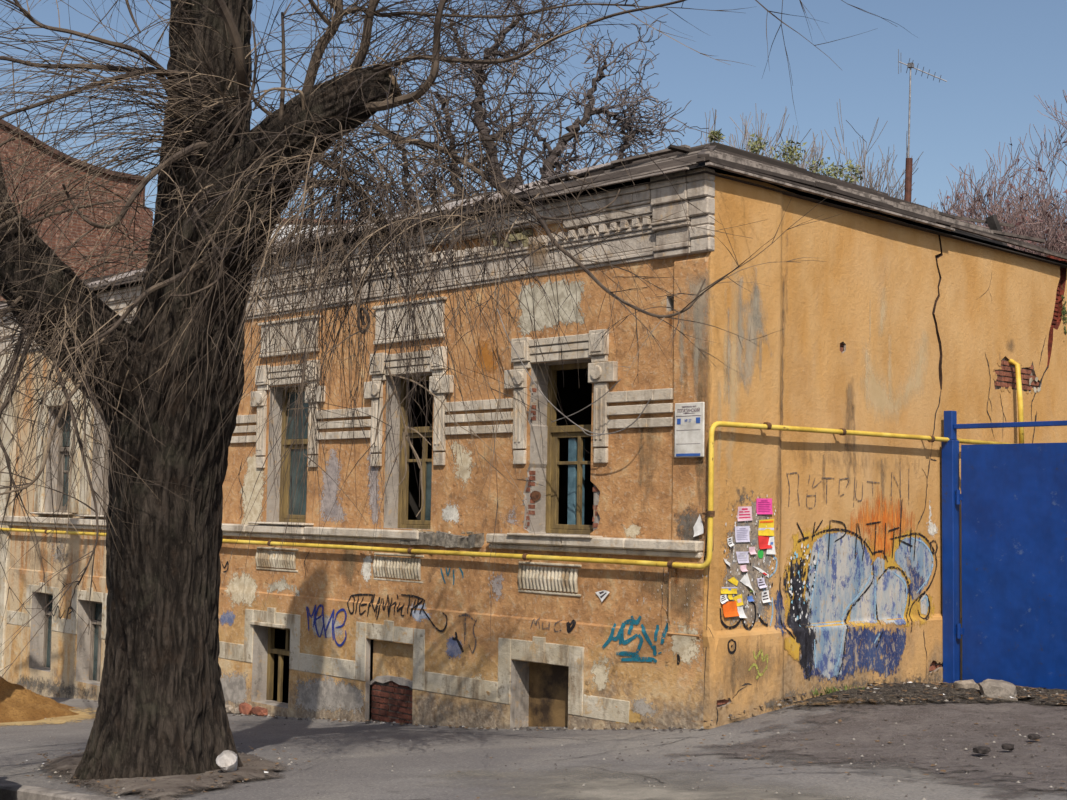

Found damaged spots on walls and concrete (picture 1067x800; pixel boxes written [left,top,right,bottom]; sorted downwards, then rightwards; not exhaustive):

peeling [513,273,585,339]
damp [727,278,762,418]
flaking render [993,358,1041,394]
crack [985,255,1067,443]
peeling [318,448,347,528]
peeling [441,500,463,527]
peeling [451,440,479,487]
flaking render [497,468,546,532]
flaking render [592,485,600,531]
crack [917,388,942,527]
peeling [221,567,302,614]
peeling [662,621,704,669]